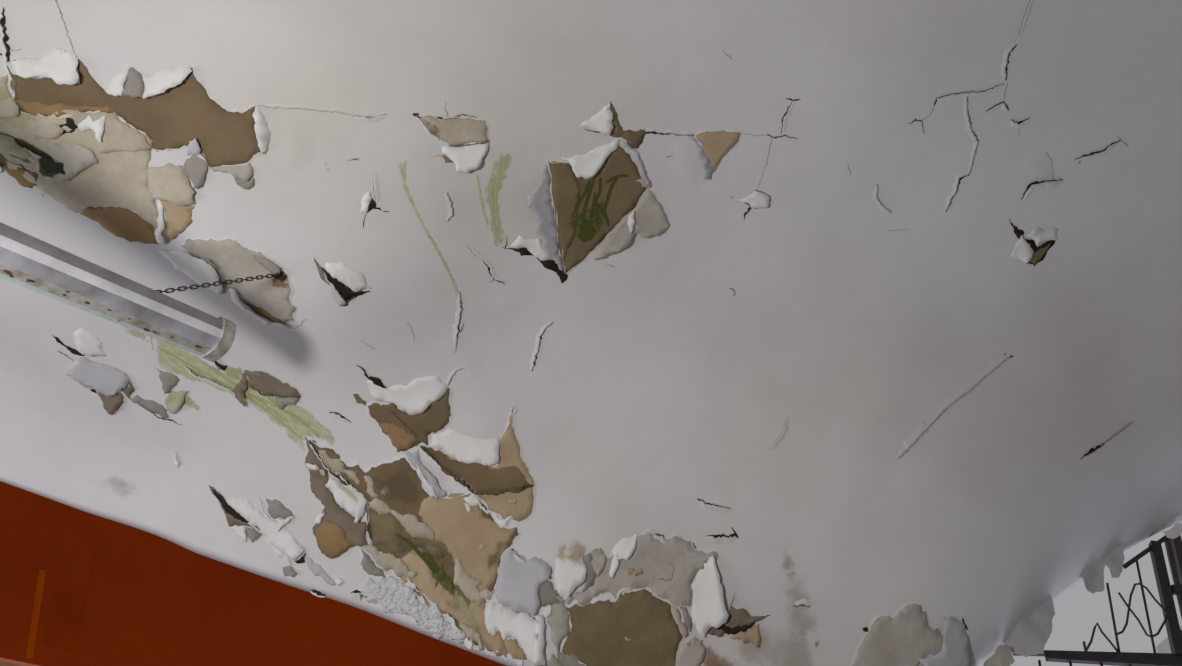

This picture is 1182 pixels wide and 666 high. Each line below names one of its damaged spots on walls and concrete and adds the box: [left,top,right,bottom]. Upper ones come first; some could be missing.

peeling [2,48,306,329]
peeling [413,101,491,173]
peeling [502,101,743,284]
crack [909,0,1035,212]
crack [1021,139,1128,201]
peeling [1009,219,1058,266]
peeling [314,258,371,307]
peeling [52,328,189,426]
peeling [180,348,301,409]
crack [1081,422,1134,461]
peeling [209,365,770,666]
peeling [850,597,1055,666]